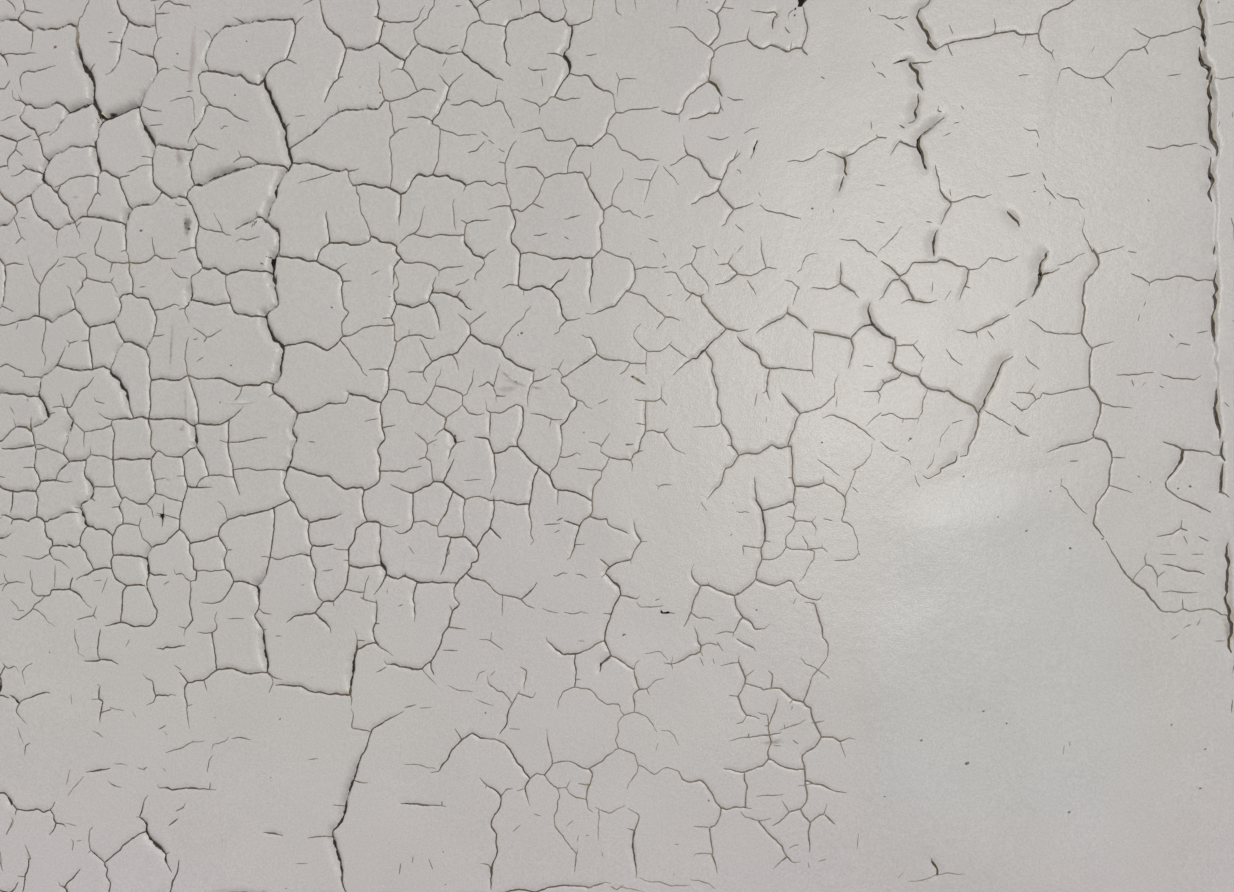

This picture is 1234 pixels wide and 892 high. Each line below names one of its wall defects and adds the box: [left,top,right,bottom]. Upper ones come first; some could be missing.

crack [937,0,1073,76]
crack [635,145,752,225]
crack [791,122,887,212]
crack [681,242,777,294]
crack [843,165,1016,303]
crack [0,0,685,892]
peeling [1214,388,1222,438]
crack [405,262,1028,886]